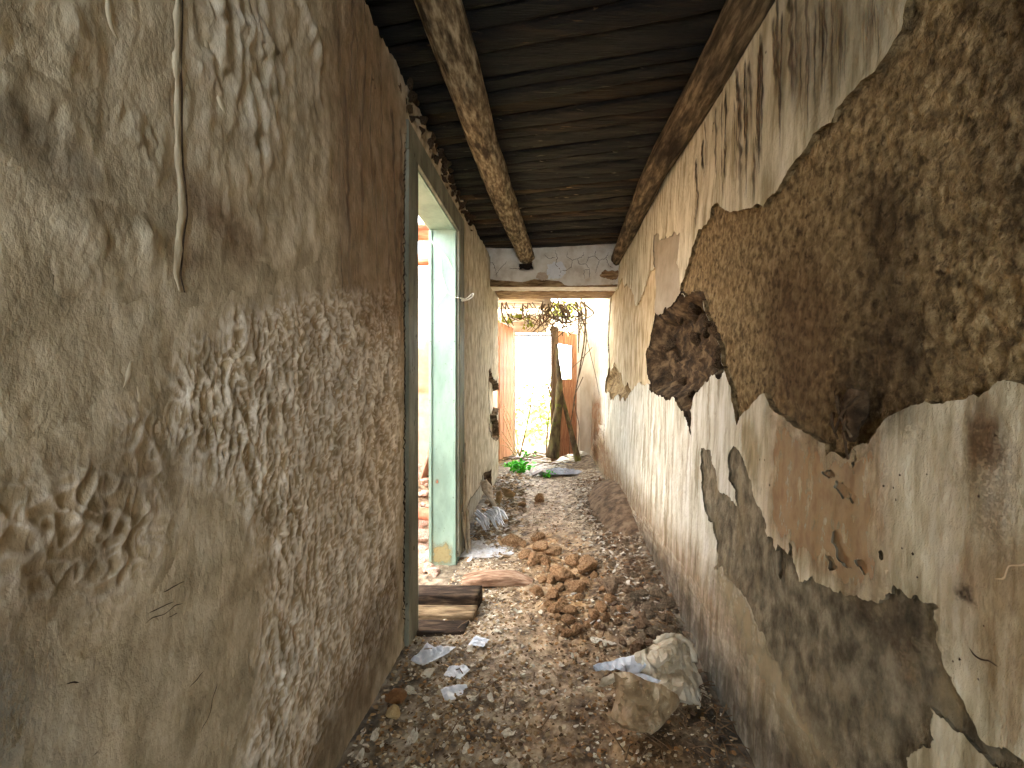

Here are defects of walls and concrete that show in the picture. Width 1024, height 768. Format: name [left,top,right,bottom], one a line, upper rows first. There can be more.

damp [695,0,846,213]
flaking render [600,0,1024,472]
flaking render [488,368,499,441]
damp [637,526,834,768]
damp [961,553,1024,647]